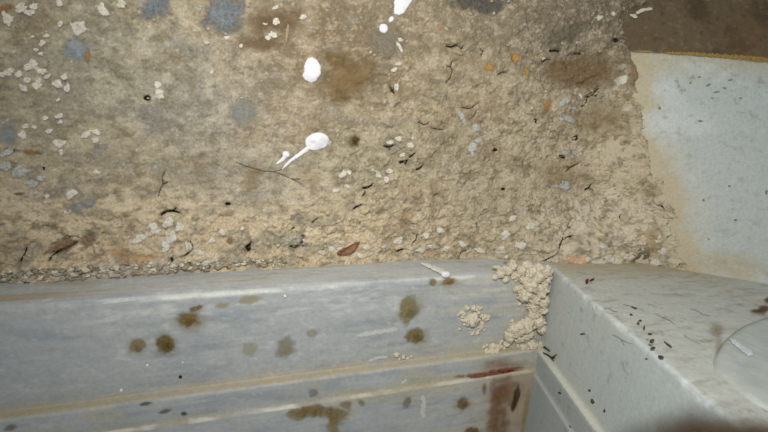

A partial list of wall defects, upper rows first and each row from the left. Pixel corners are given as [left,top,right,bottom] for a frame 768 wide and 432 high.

water stain [179,305,202,326]
water stain [400,297,423,343]
water stain [131,340,144,351]
water stain [157,335,174,352]
corrosion [461,362,520,432]